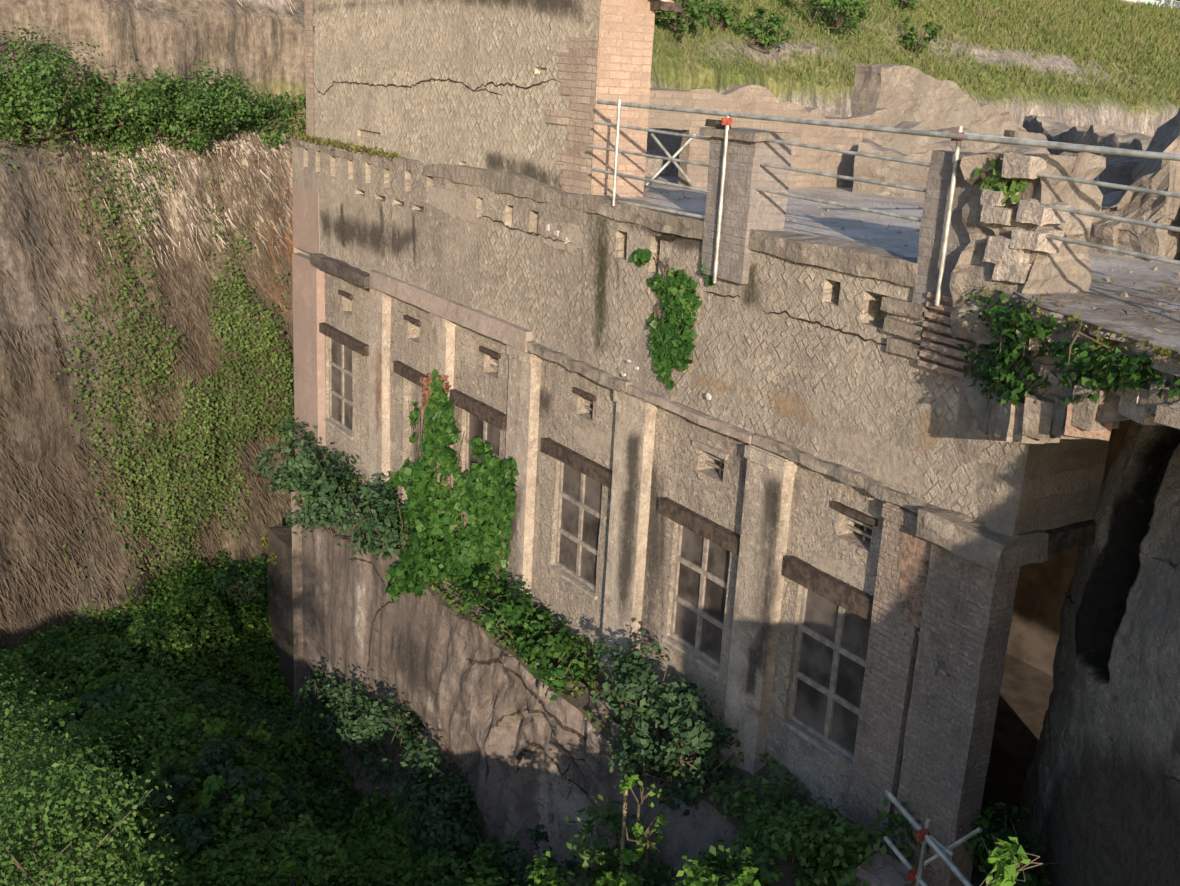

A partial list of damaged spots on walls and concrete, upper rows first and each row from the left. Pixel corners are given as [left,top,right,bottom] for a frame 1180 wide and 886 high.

water stain [467,0,577,13]
crack [314,78,555,95]
water stain [322,205,415,257]
crack [705,291,887,368]
crack [349,557,398,675]
water stain [619,436,661,646]
water stain [747,481,780,692]
crack [466,651,591,802]